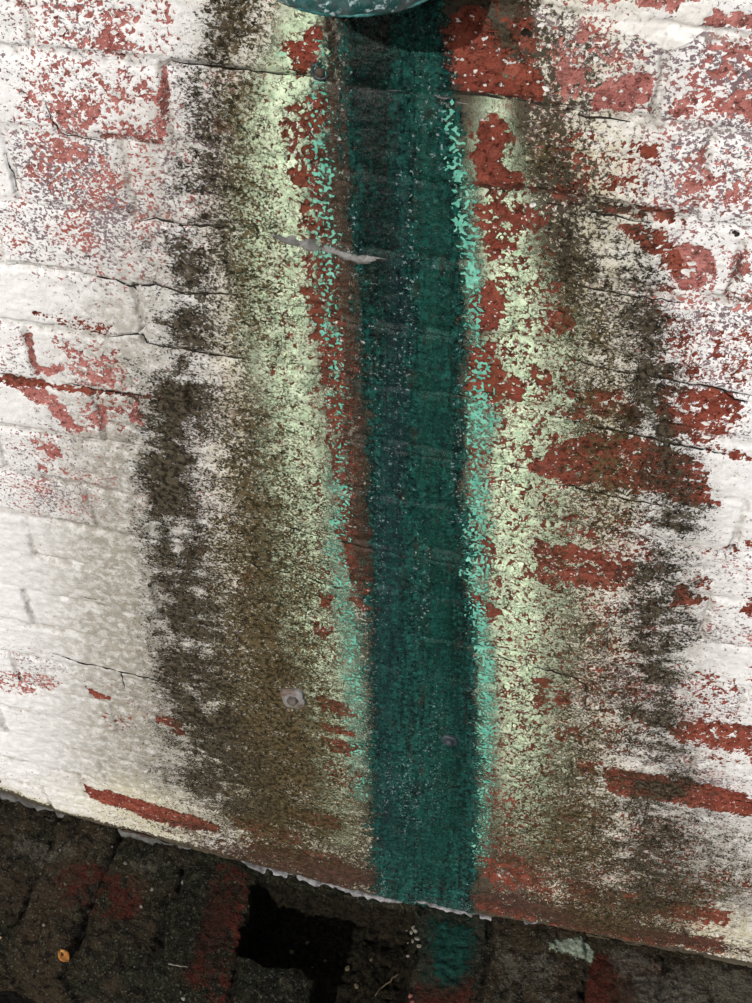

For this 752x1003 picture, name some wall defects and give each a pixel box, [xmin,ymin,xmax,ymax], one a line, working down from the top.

peeling [702,0,752,29]
peeling [8,0,183,214]
peeling [439,0,708,121]
peeling [701,42,752,132]
crack [84,273,248,299]
peeling [0,311,164,473]
crack [111,327,248,359]
peeling [83,20,380,877]
crack [555,417,726,454]
crack [572,359,752,402]
peeling [462,113,752,956]
water stain [548,936,594,963]